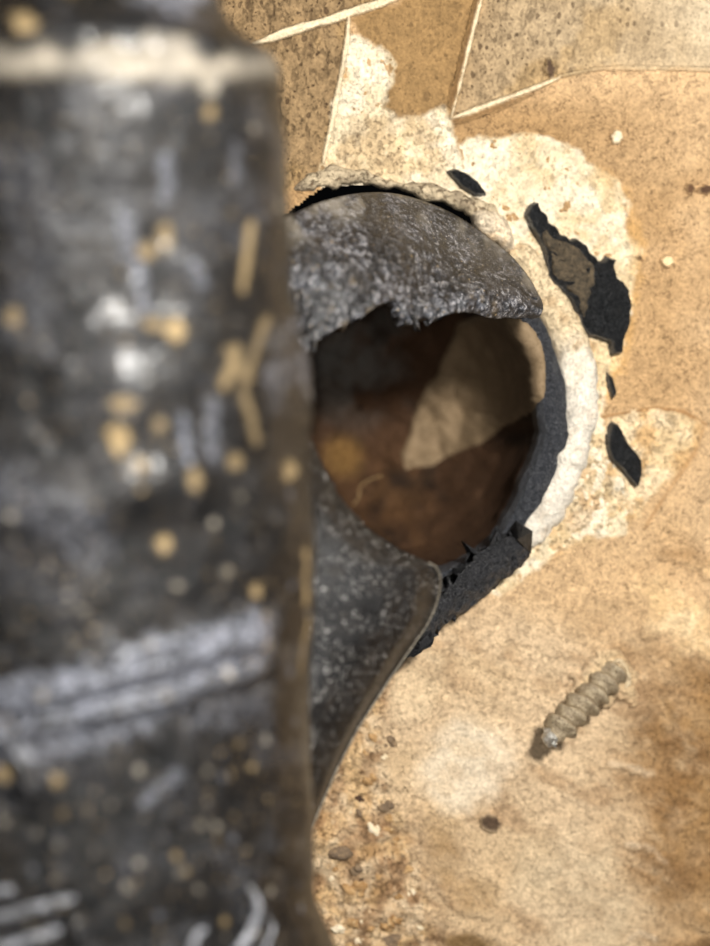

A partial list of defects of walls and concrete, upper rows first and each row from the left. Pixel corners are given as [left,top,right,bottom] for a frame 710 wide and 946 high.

crack [254,0,402,166]
crack [447,0,560,126]
flaking render [317,32,710,600]
leakage [385,541,710,946]